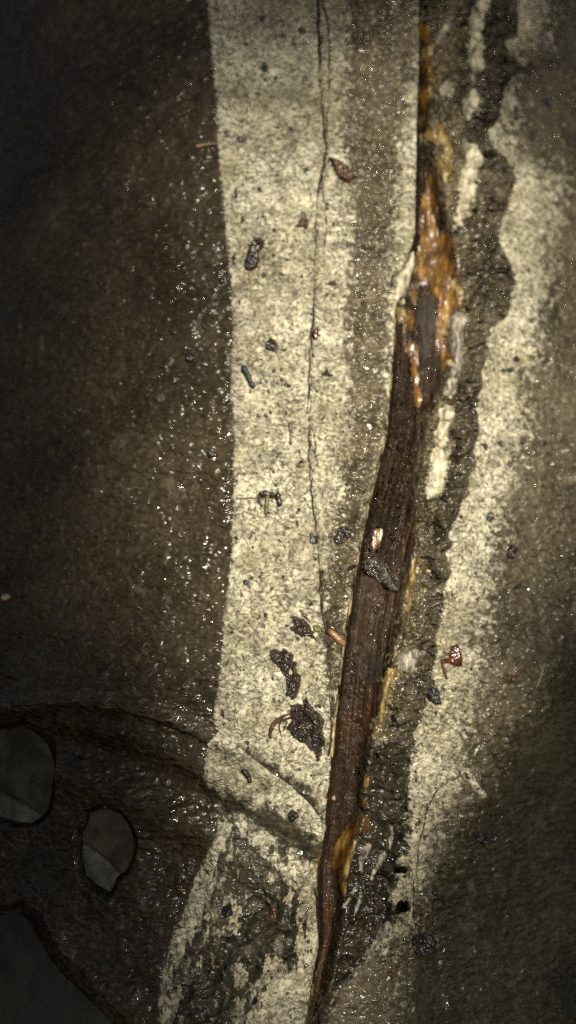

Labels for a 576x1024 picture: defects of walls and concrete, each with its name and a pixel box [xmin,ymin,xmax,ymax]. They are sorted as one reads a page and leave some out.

peeling [435,16,452,46]
peeling [439,0,490,120]
corrosion [394,10,464,407]
peeling [453,139,483,228]
peeling [396,298,411,322]
peeling [425,312,468,499]
crack [306,0,472,1024]
peeling [398,649,426,677]
corrosion [331,774,370,896]